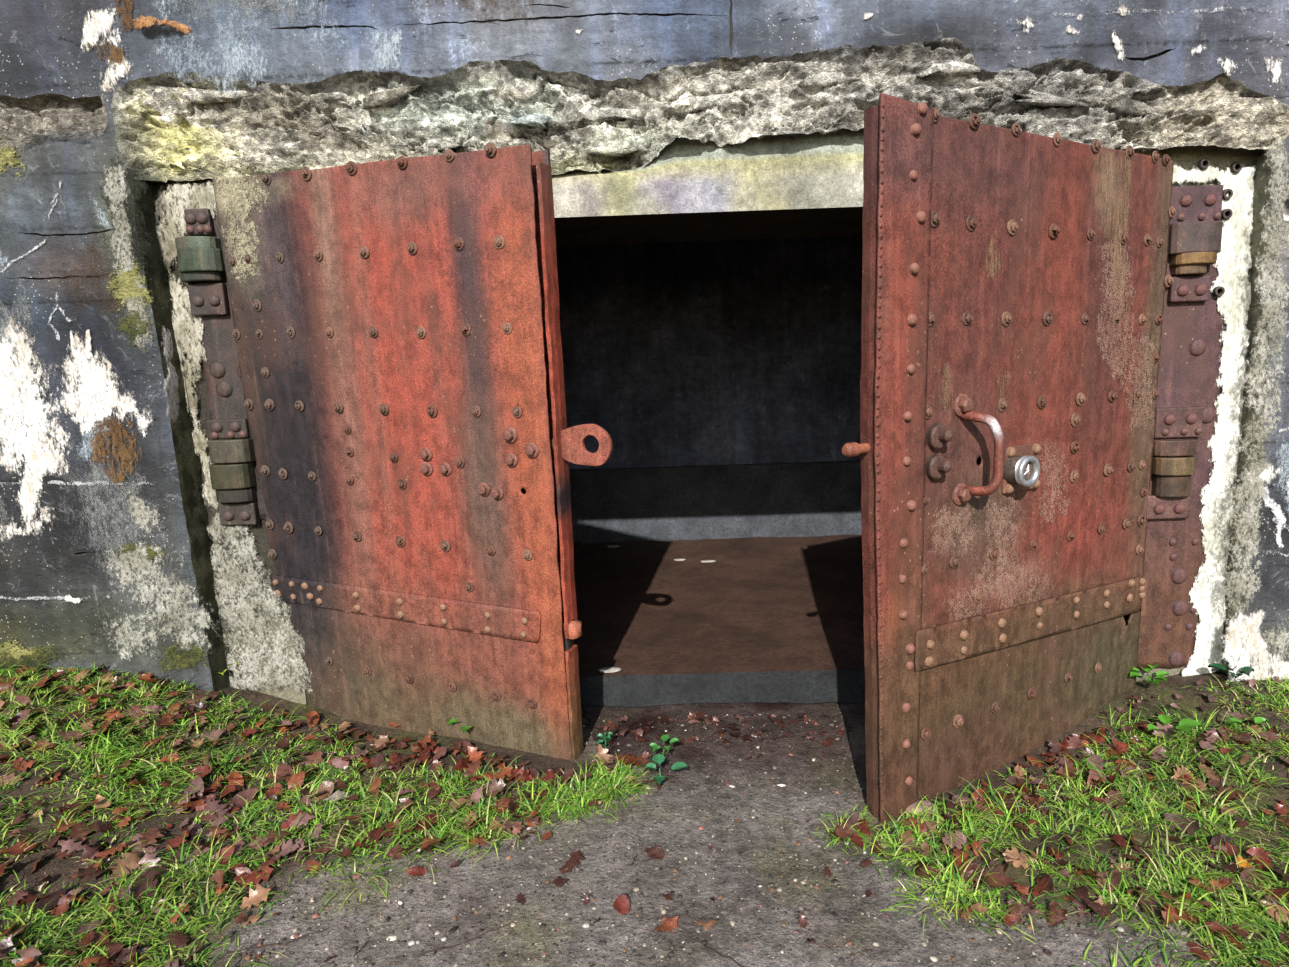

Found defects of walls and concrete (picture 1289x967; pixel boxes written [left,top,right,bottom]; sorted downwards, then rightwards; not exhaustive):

corrosion [114,0,191,38]
crack [269,0,733,55]
water stain [0,319,213,659]
spalling [0,37,1289,692]